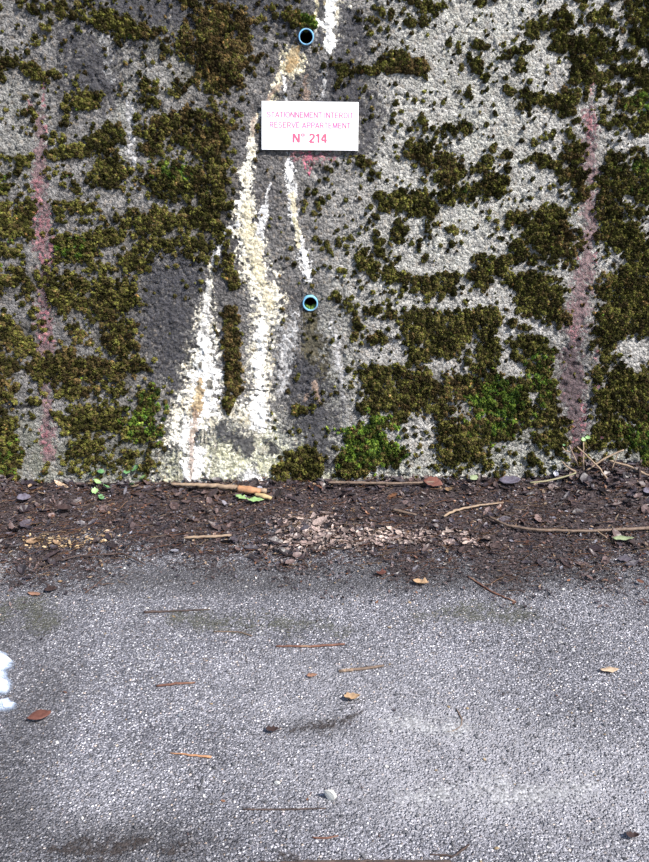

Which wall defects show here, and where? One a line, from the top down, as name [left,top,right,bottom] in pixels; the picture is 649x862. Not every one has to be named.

damp [50,0,389,168]
damp [124,111,363,486]